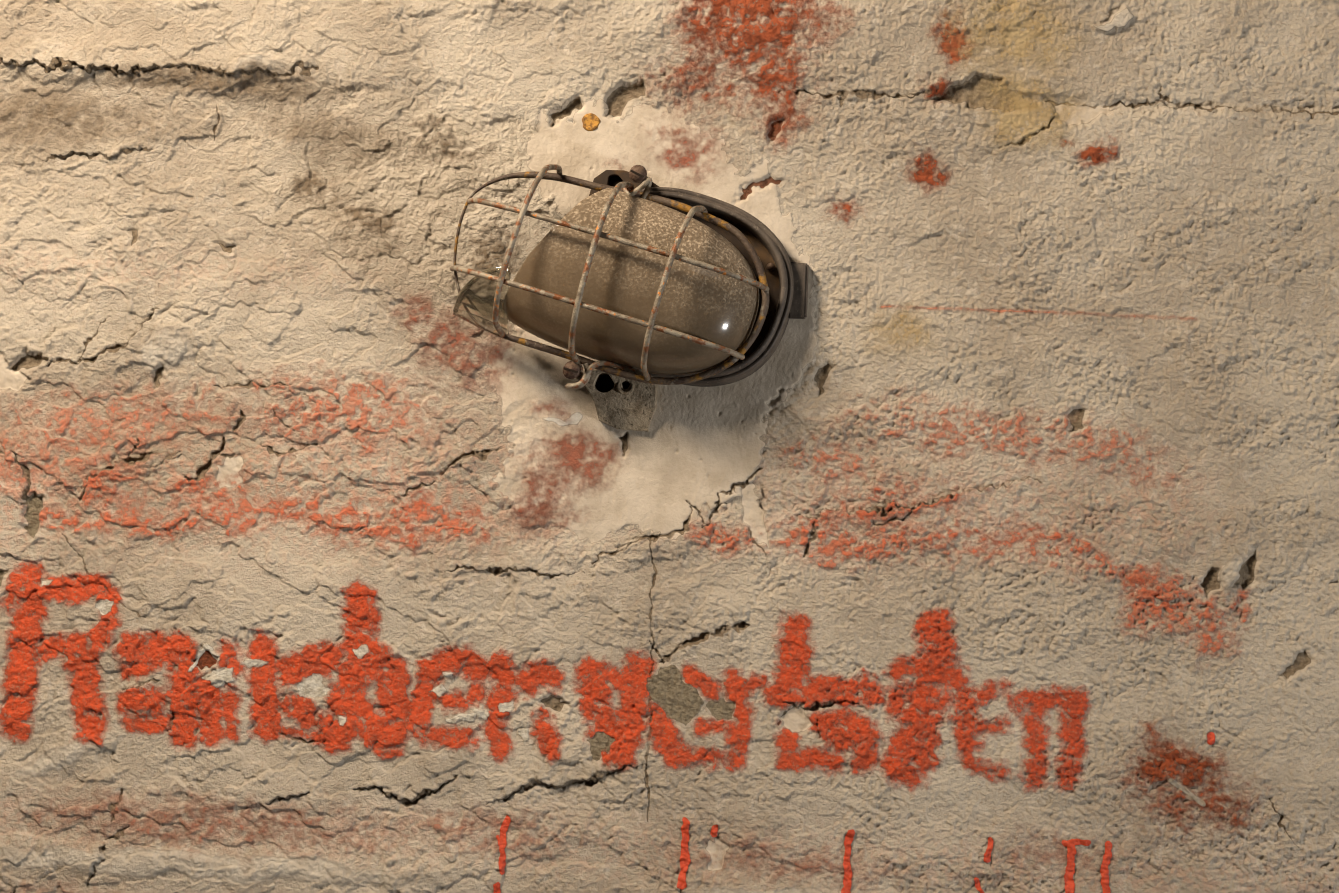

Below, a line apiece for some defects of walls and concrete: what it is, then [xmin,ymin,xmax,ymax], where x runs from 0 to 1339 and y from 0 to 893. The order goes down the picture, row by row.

crack [0,57,319,76]
flaking render [551,99,582,126]
flaking render [607,84,646,117]
flaking render [768,121,783,141]
crack [1008,86,1339,146]
crack [42,147,153,162]
flaking render [740,176,781,200]
crack [48,308,158,367]
crack [78,380,317,501]
flaking render [741,483,770,548]
crack [448,468,763,822]
crack [353,775,457,807]